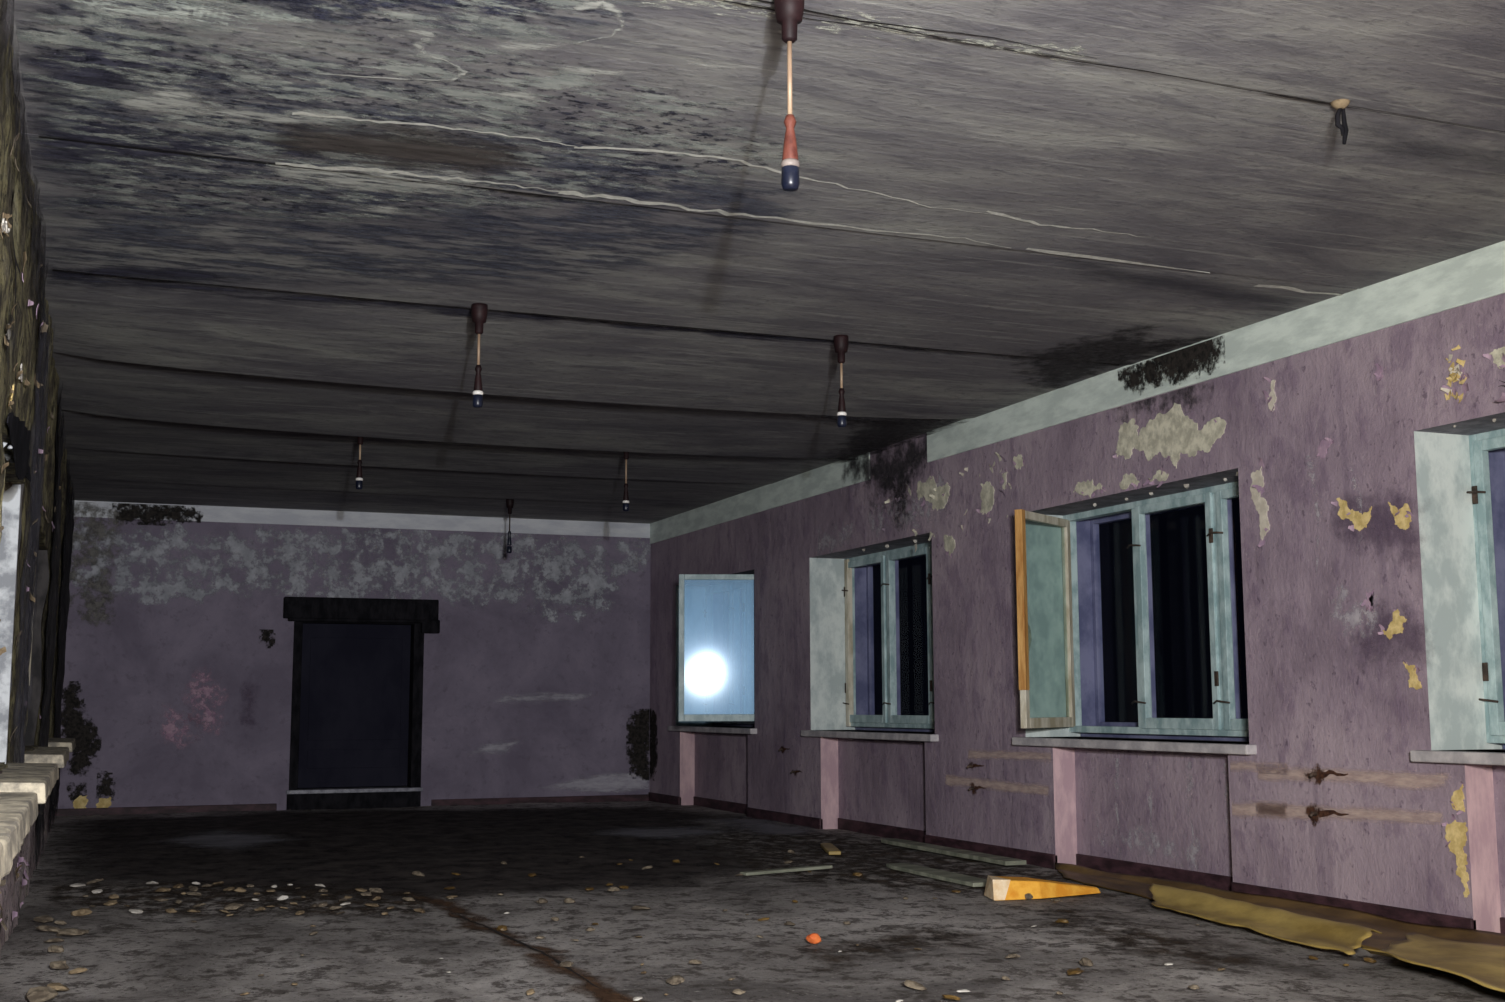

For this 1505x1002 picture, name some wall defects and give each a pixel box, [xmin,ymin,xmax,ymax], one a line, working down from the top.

crack [723,0,1502,133]
peeling [1440,345,1505,422]
peeling [1073,403,1226,507]
spalling [1331,498,1412,532]
peeling [72,520,651,623]